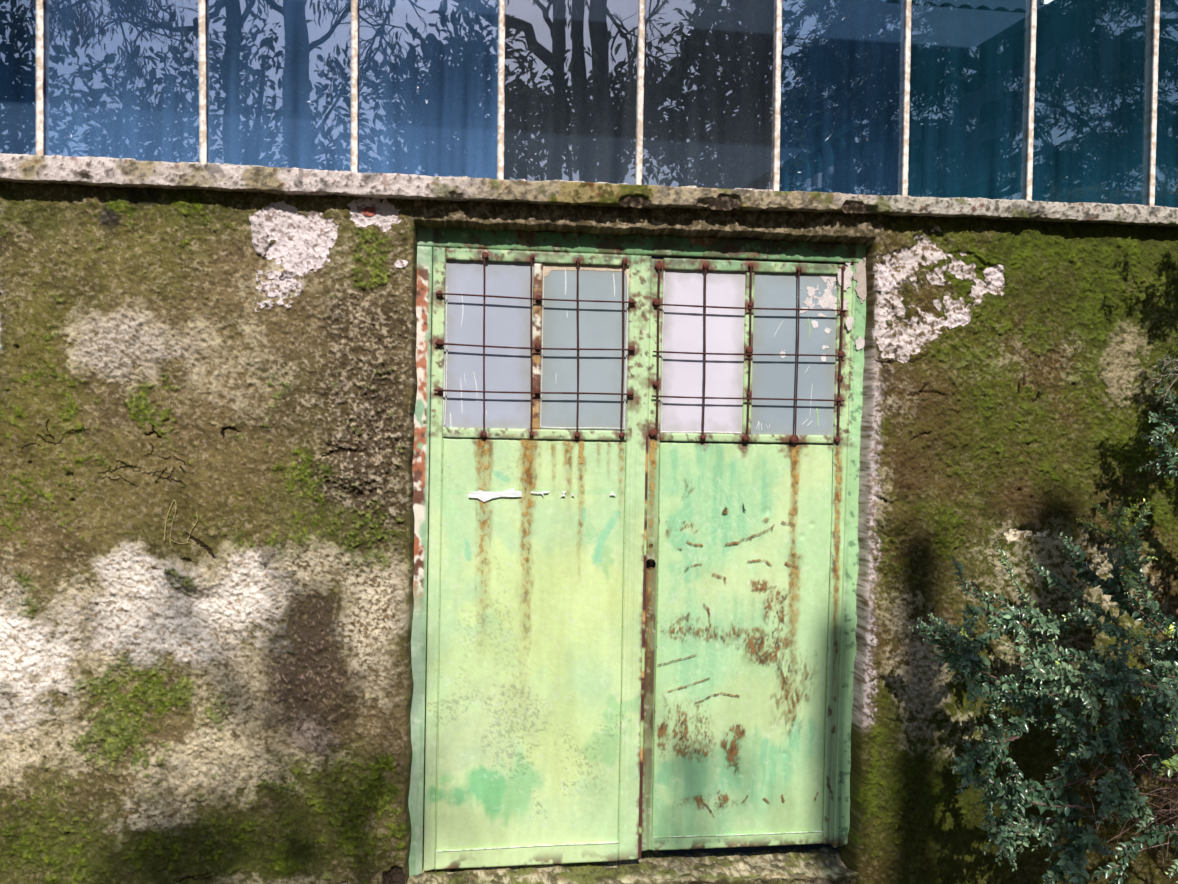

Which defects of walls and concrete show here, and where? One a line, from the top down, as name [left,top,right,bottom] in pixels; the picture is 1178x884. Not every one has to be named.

spalling [249,197,402,312]
spalling [871,225,1005,363]
damp [0,548,397,748]
corrosion [477,440,492,572]
corrosion [521,440,538,598]
corrosion [552,441,584,503]
corrosion [649,441,809,725]
corrosion [658,705,745,773]
corrosion [685,793,729,810]